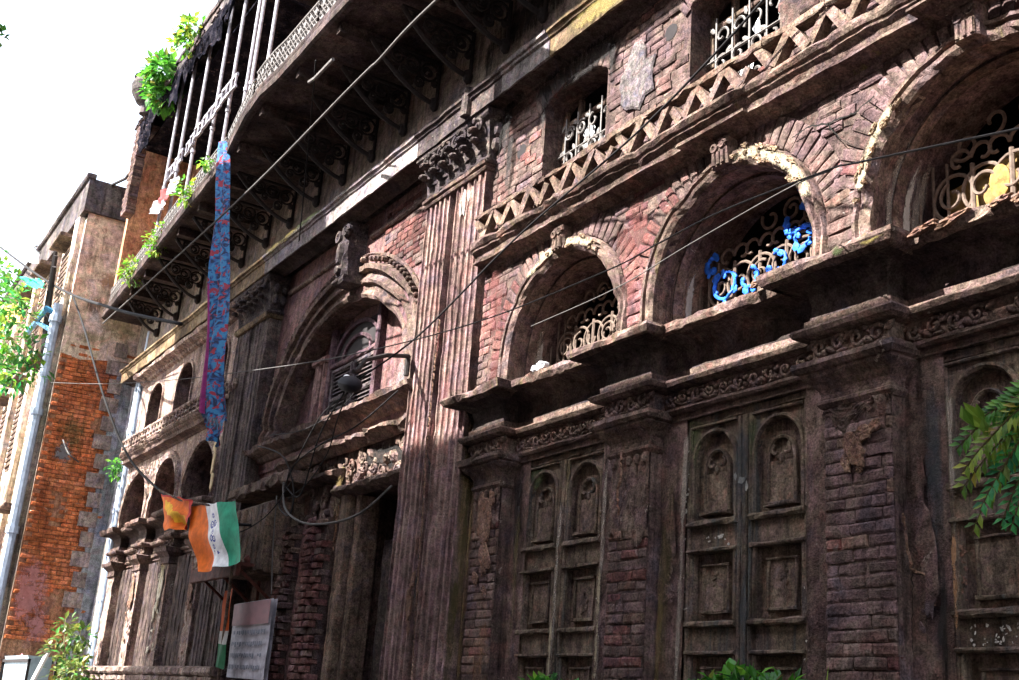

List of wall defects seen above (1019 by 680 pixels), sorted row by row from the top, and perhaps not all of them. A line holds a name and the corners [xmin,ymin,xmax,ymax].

flaking render [729,142,809,197]
flaking render [840,418,881,474]
flaking render [471,490,495,598]
flaking render [912,452,940,633]